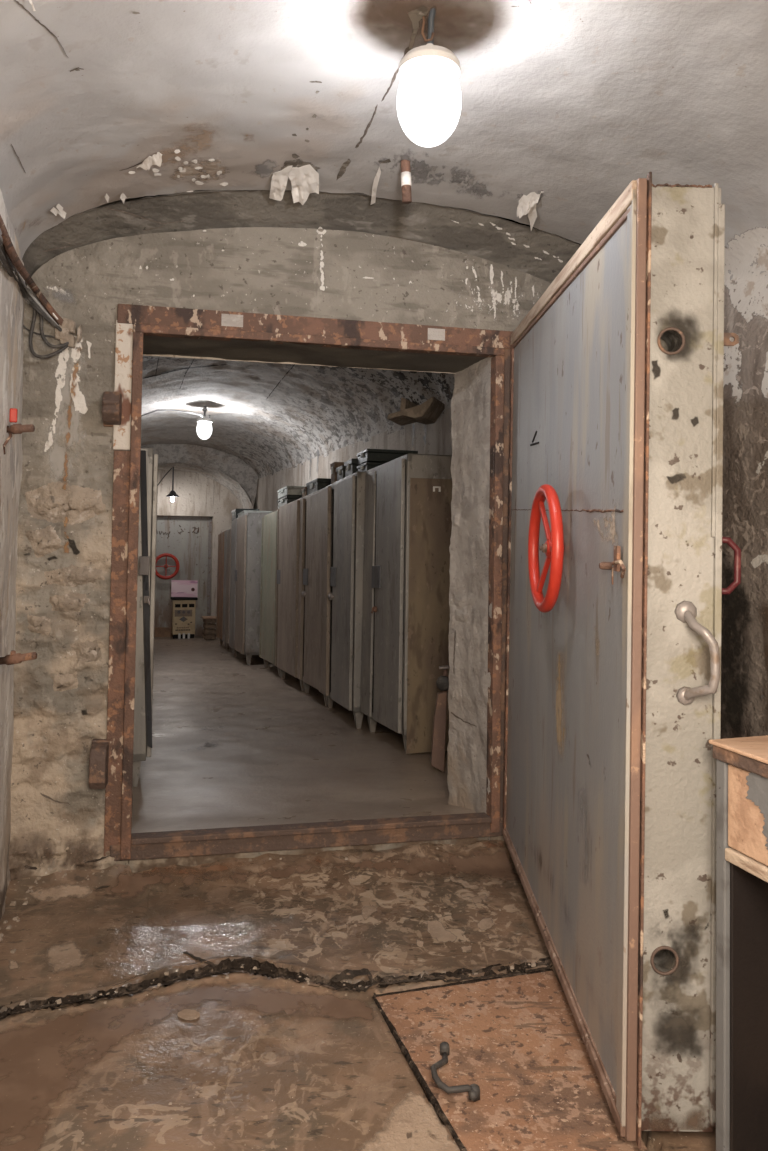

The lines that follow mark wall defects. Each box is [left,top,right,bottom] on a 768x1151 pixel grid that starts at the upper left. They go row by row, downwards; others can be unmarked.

flaking render [119,149,228,192]
flaking render [50,204,66,219]
damp [316,227,327,291]
peeling [724,226,768,324]
peeling [723,337,742,406]
damp [721,552,768,732]
crack [0,951,553,1019]